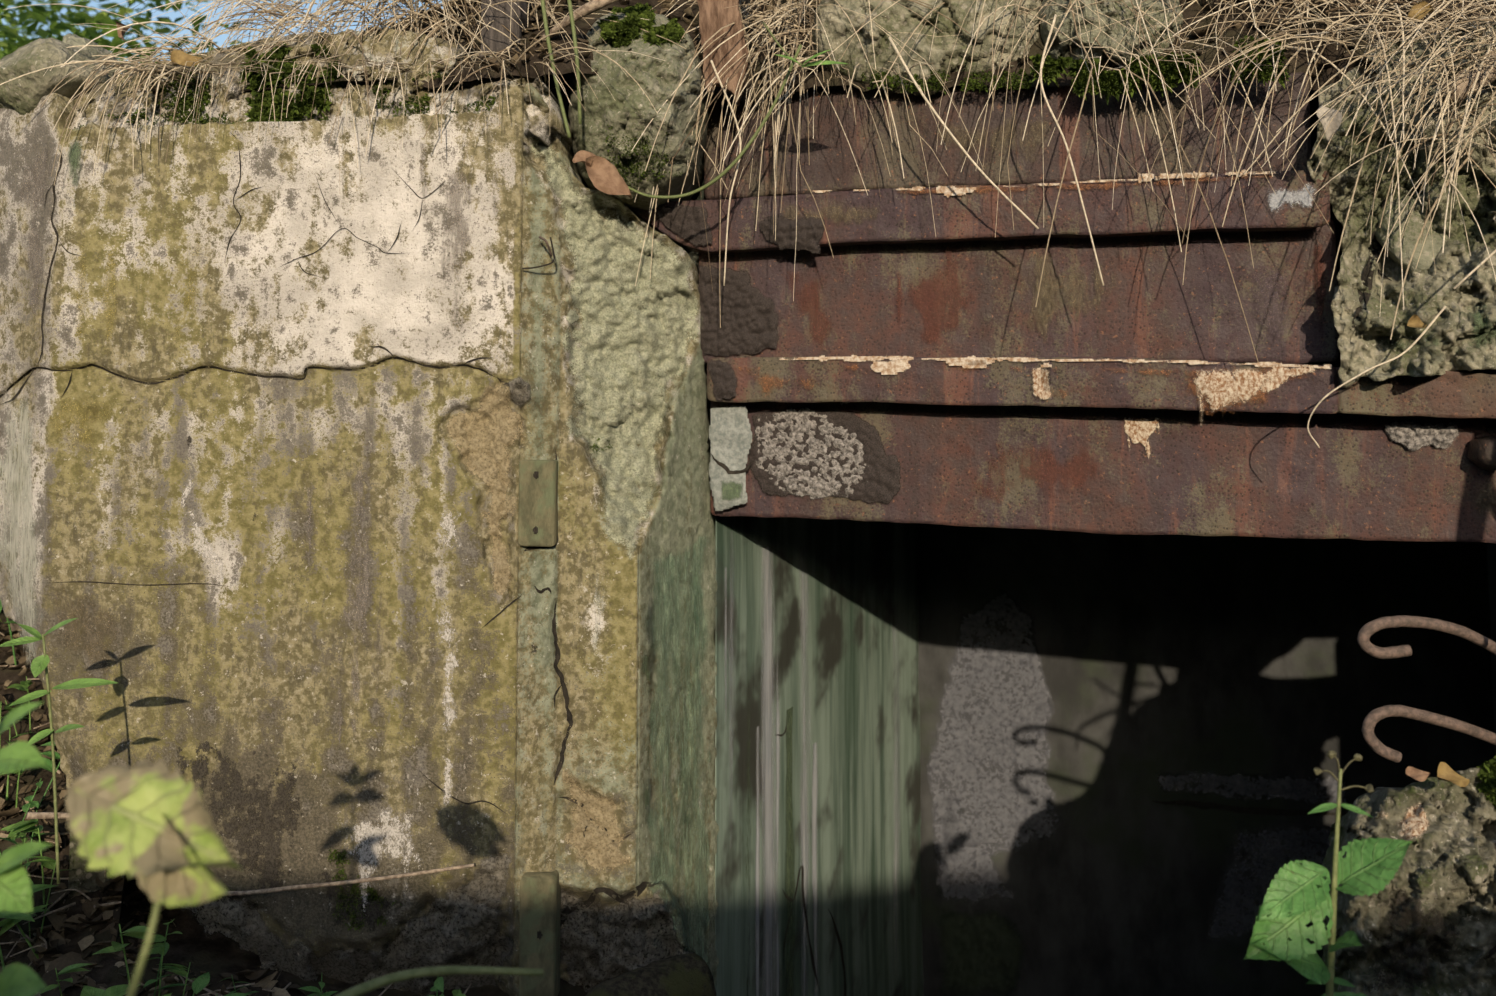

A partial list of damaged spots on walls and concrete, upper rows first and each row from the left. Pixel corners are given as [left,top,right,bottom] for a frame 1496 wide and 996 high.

crack [0,133,509,404]
spalling [530,138,700,557]
rust [759,214,825,253]
rust [697,265,1332,411]
rust [896,170,1276,197]
water stain [437,613,458,731]
crack [484,537,662,926]
spalling [1362,705,1496,763]
water stain [176,741,304,889]
spalling [183,854,514,995]
water stain [322,812,420,931]
flaking render [1207,825,1331,939]